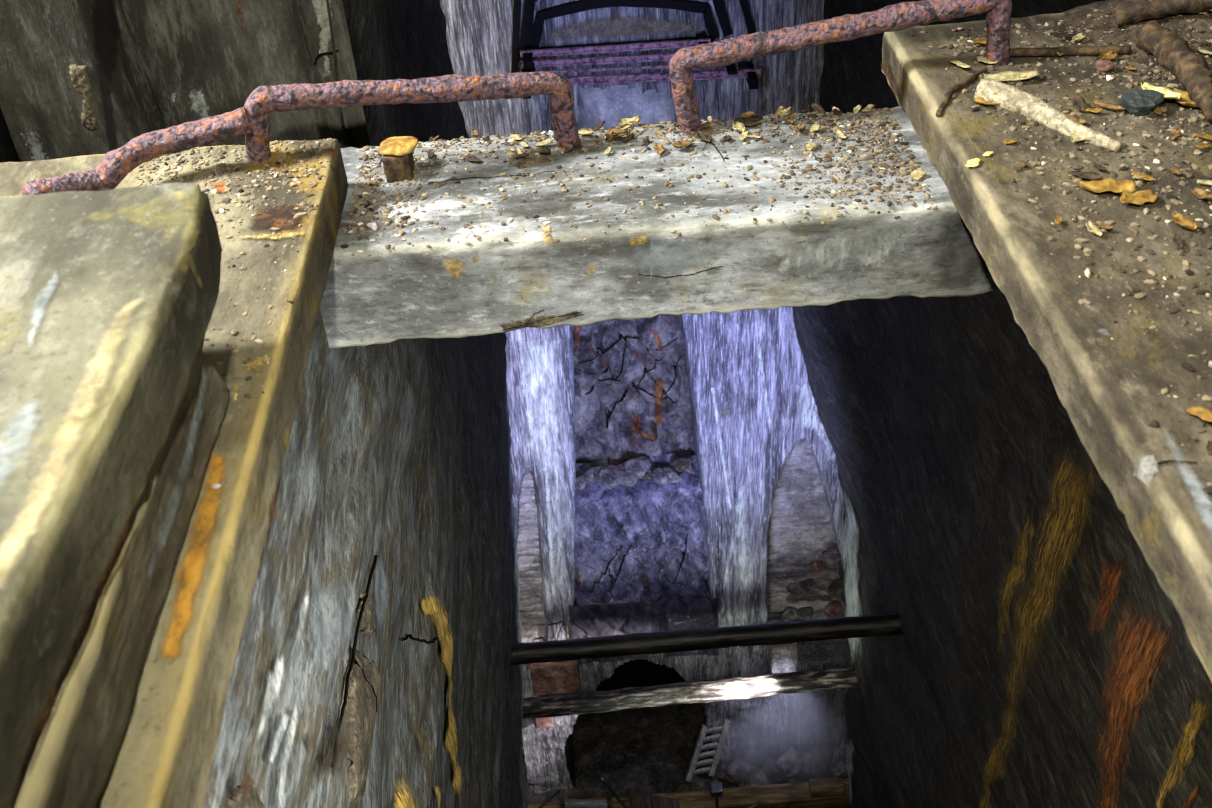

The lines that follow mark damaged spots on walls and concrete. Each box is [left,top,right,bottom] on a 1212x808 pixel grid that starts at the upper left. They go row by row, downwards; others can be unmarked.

rust [669,0,1012,136]
rust [22,71,580,195]
crack [578,334,681,428]
crack [330,555,378,767]
damp [394,781,417,808]
crack [402,634,440,644]
damp [421,596,462,808]
rust [1090,564,1169,808]
rust [1156,699,1206,808]